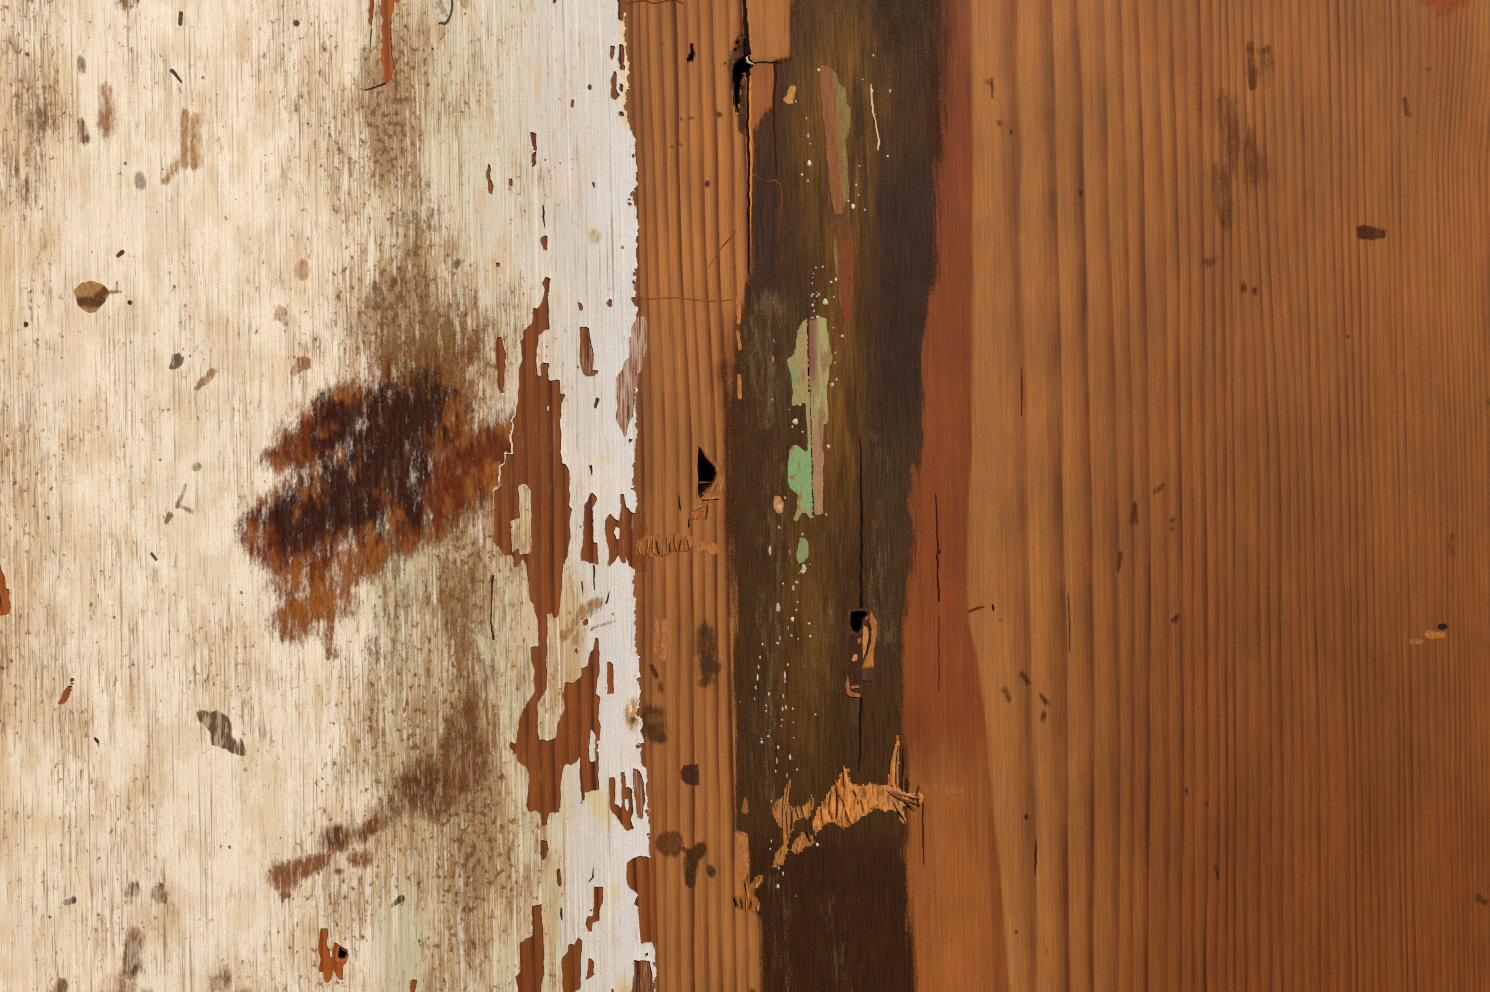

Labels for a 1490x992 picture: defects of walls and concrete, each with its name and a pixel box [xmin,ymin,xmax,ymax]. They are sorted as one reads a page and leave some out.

peeling [493,277,724,887]
damp [697,0,948,992]
spalling [732,735,925,913]
peeling [516,887,603,992]
peeling [626,854,657,992]